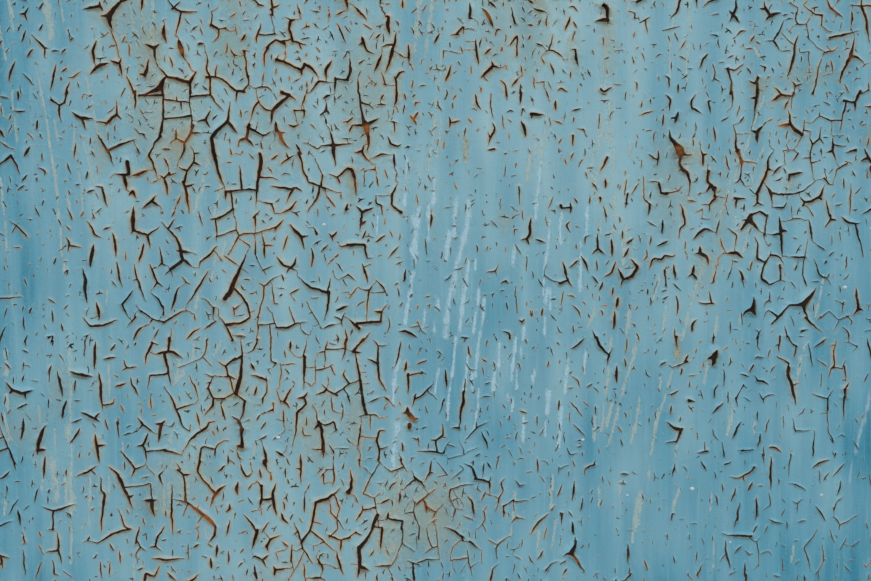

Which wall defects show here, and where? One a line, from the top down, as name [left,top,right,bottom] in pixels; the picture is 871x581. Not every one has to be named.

crack [0,0,650,581]
crack [408,0,871,581]